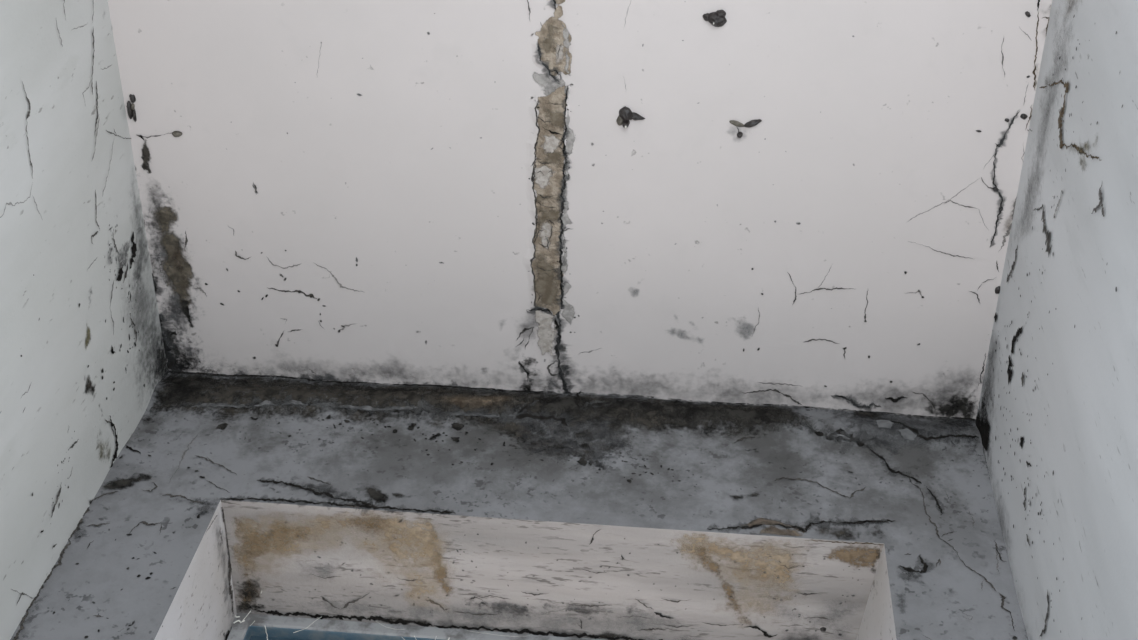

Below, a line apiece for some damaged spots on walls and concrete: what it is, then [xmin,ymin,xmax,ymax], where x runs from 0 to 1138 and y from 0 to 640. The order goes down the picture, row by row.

crack [56,0,113,244]
spalling [523,0,579,355]
crack [908,0,1104,303]
damp [105,282,141,354]
damp [94,473,202,518]
crack [170,436,465,536]
crack [136,195,638,426]
damp [234,517,644,640]
damp [157,295,1042,528]
damp [682,535,791,623]
crack [787,269,868,322]
crack [709,381,1017,640]